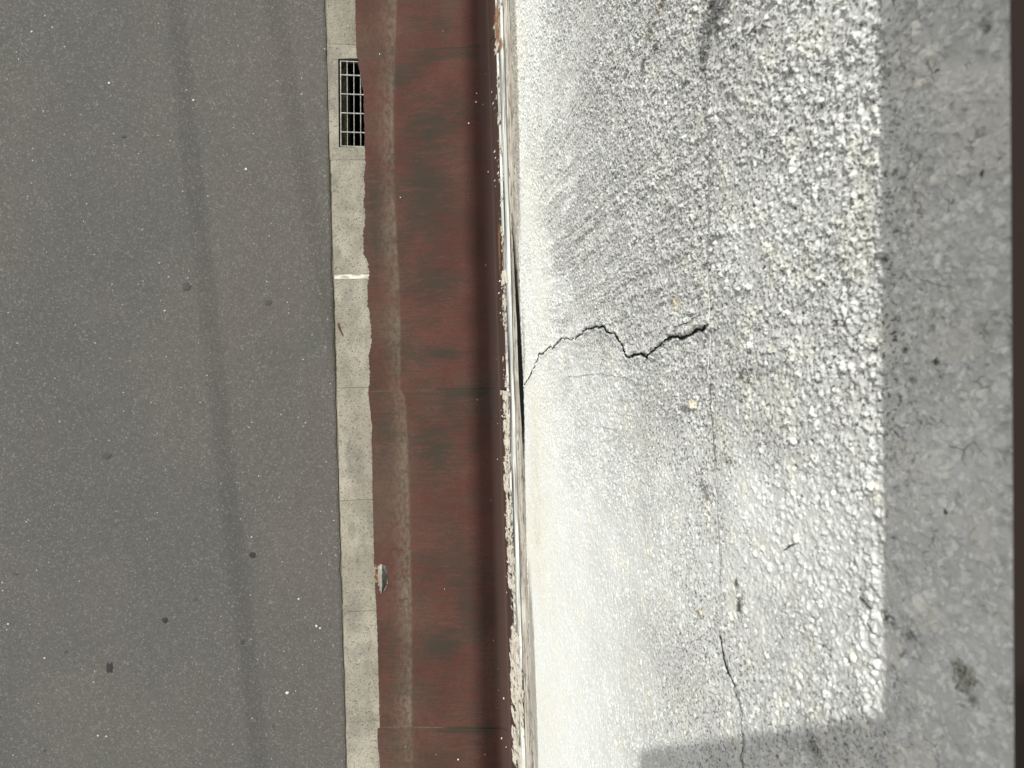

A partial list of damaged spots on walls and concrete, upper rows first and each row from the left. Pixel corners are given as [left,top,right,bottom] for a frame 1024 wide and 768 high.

crack [511,43,744,765]